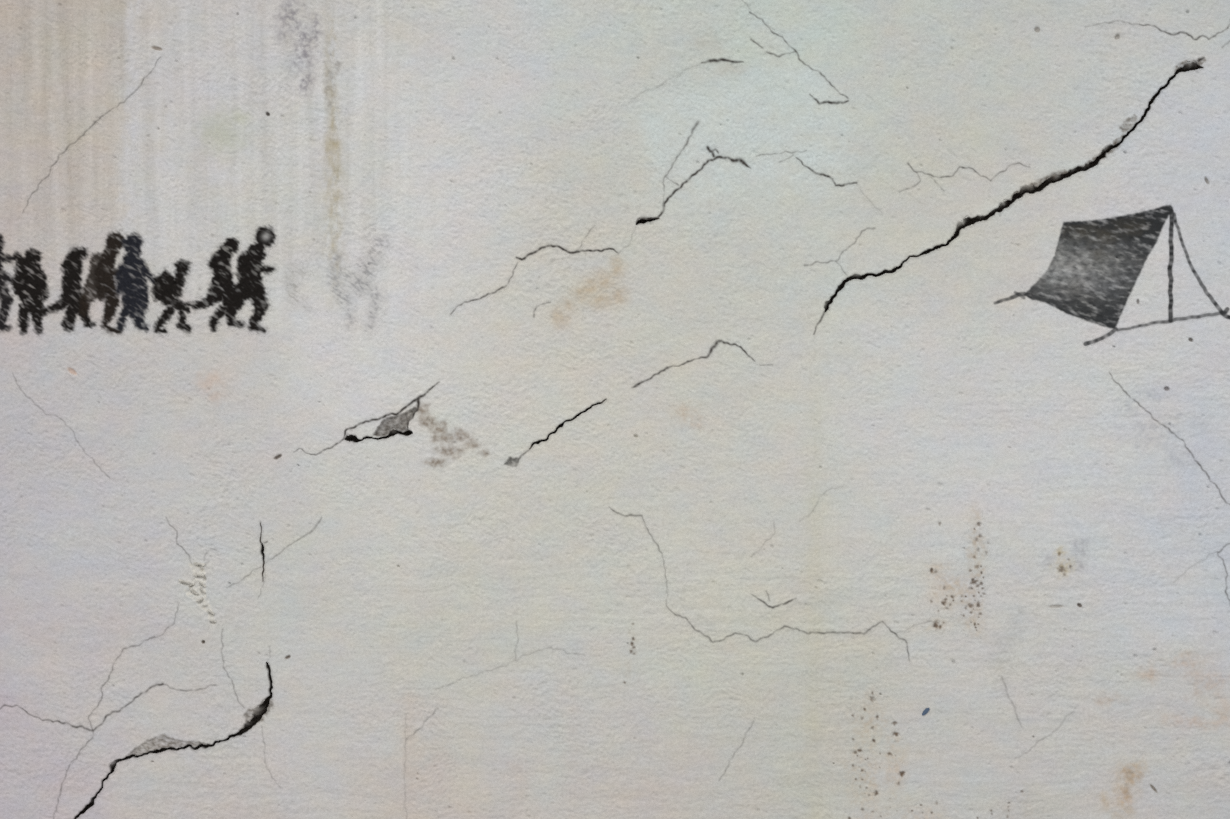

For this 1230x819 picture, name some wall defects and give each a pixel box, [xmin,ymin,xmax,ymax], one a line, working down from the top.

crack [448,18,1230,336]
spalling [272,380,441,461]
crack [518,338,775,461]
crack [165,516,218,563]
crack [225,516,323,601]
crack [750,485,845,558]
crack [0,602,282,819]